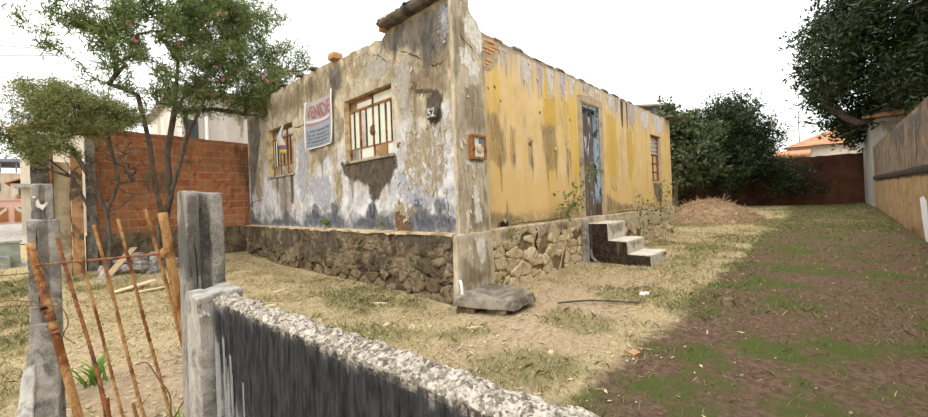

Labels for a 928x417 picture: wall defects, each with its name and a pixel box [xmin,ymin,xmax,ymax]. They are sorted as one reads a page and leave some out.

peeling [344,46,439,117]
peeling [458,15,508,108]
peeling [521,58,663,137]
leakage [341,154,397,228]
peeling [393,121,449,231]
leakage [398,197,456,247]
flaking render [464,159,583,285]
leakage [543,126,571,172]